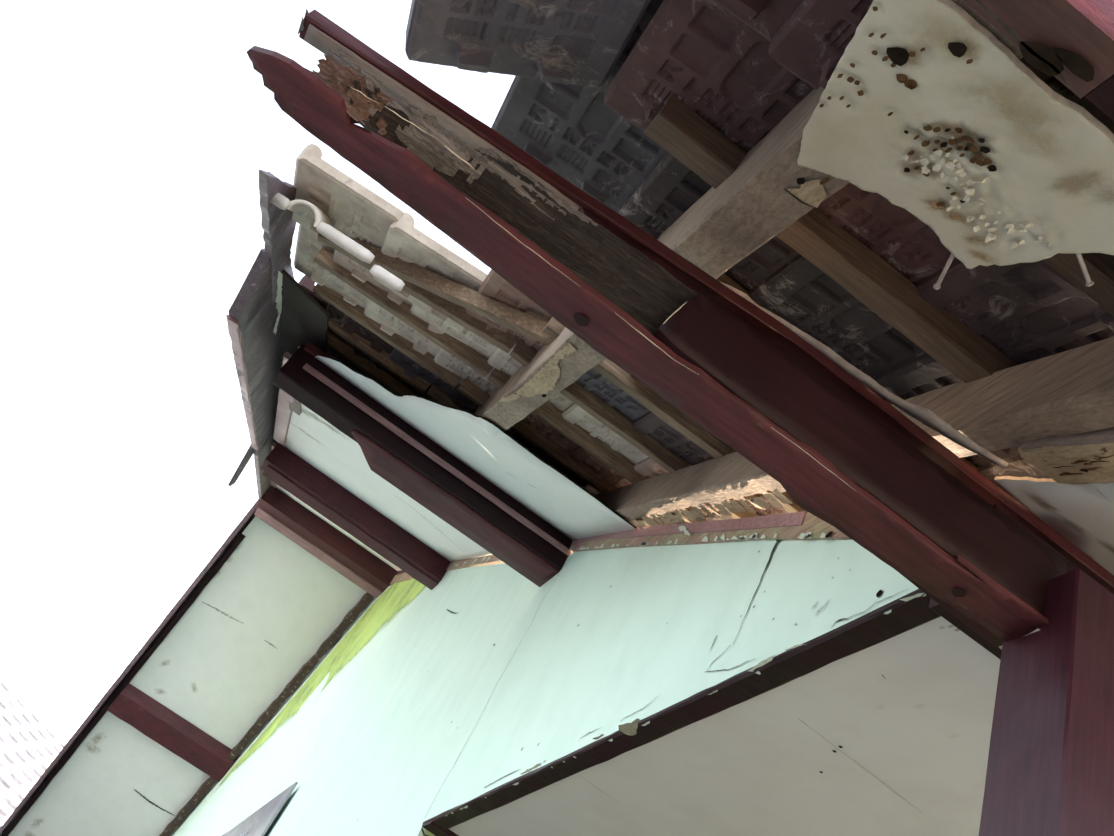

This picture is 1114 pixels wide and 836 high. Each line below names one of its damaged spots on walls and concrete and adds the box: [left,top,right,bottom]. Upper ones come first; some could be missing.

spalling [868,33,917,90]
spalling [819,63,864,108]
peeling [901,125,1051,249]
peeling [702,533,777,541]
peeling [798,531,833,539]
crack [705,540,781,672]
crack [134,789,175,816]